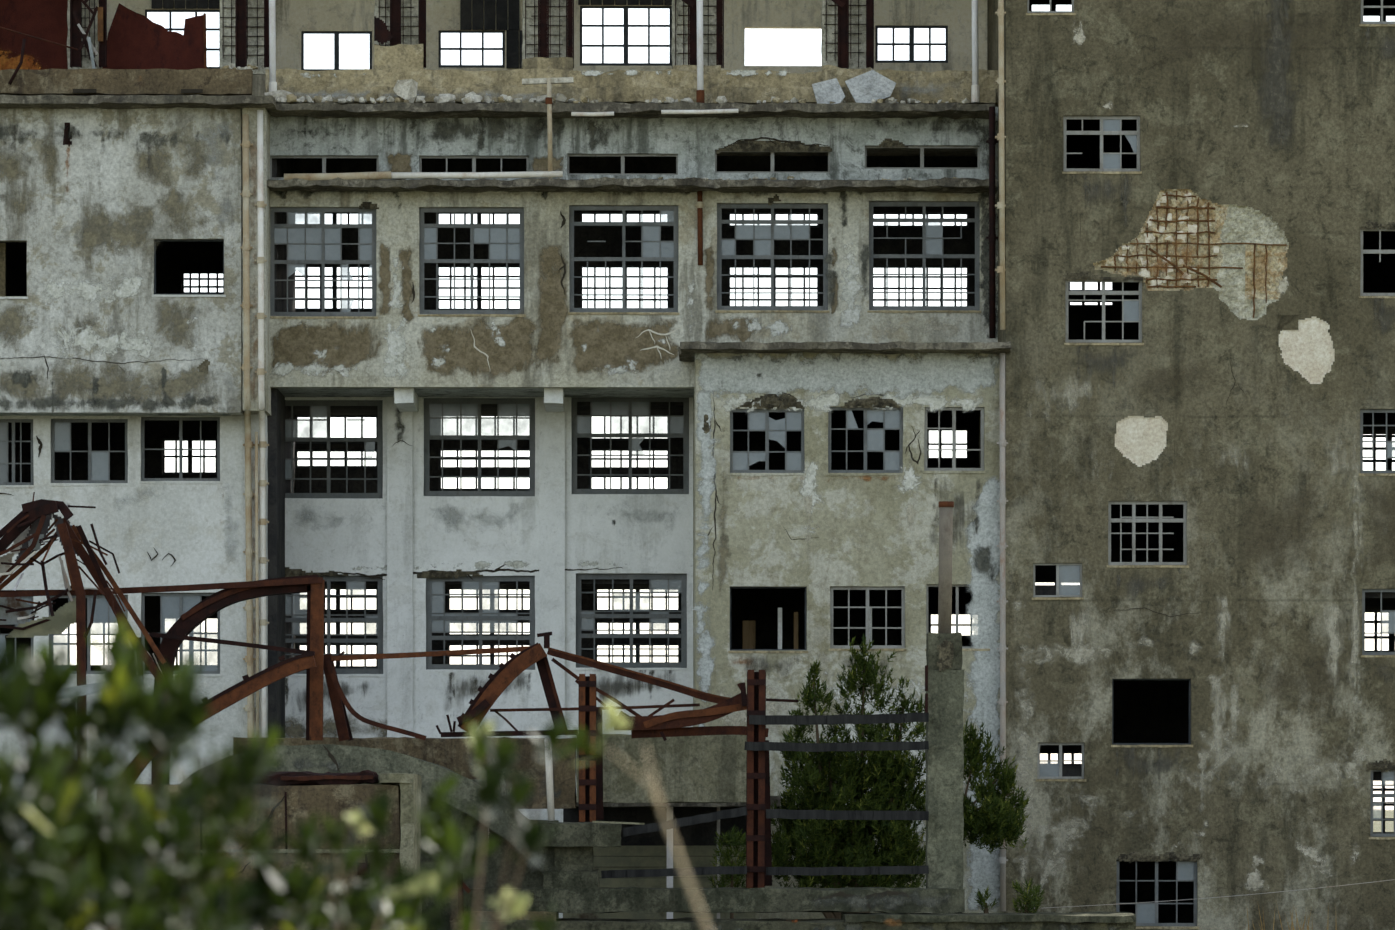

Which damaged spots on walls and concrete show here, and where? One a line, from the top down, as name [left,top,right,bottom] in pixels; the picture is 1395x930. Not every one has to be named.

corrosion [0,50,41,70]
damp [62,127,178,166]
spalling [1093,189,1289,320]
peeling [272,243,793,379]
crack [0,356,207,379]
damp [0,367,214,412]
crack [636,327,682,356]
peeling [1279,317,1335,384]
peeling [1115,416,1168,467]
damp [1187,677,1239,789]
damp [1014,732,1094,884]
damp [1246,856,1269,891]